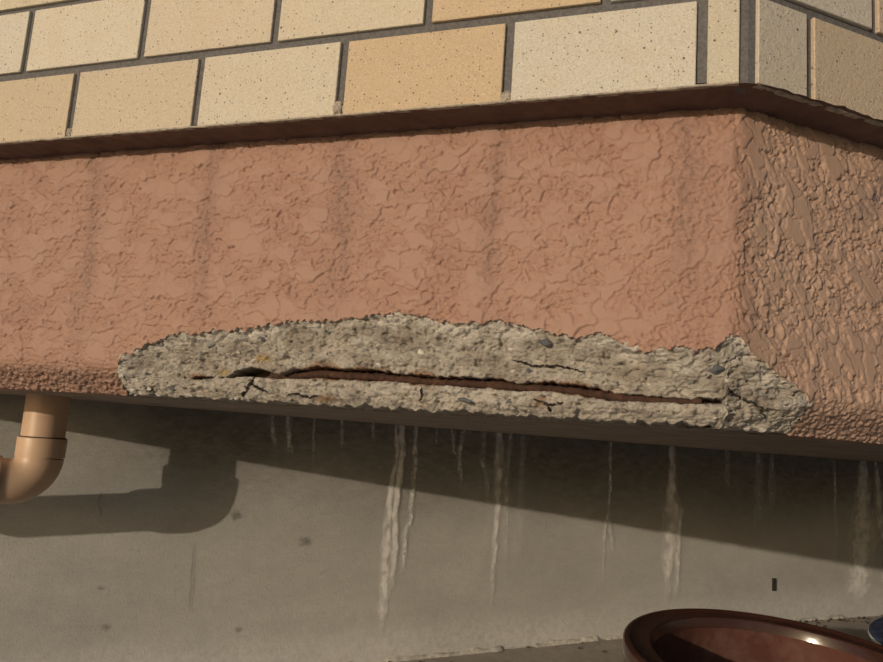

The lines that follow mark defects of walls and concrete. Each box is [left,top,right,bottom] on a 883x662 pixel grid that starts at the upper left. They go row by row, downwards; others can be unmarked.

crack [241,377,317,399]
rust [305,364,463,386]
spalling [116,311,814,434]
crack [512,359,583,372]
crack [533,398,563,412]
rust [529,381,607,397]
water stain [379,425,418,621]
water stain [492,432,511,568]
water stain [663,446,683,585]
water stain [848,461,883,598]